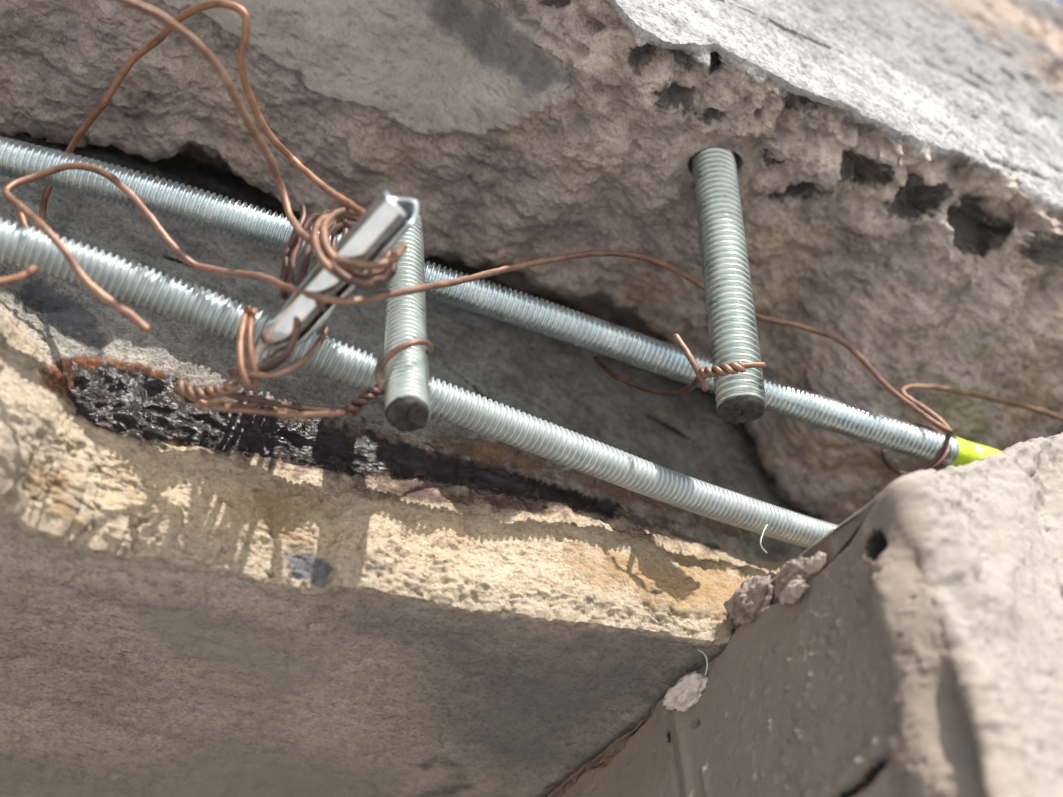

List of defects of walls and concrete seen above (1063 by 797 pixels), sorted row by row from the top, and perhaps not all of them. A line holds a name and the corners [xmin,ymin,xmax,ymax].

crack [719,0,844,53]
spalling [0,0,1063,452]
rust [32,355,748,617]
spalling [0,258,808,642]
spalling [425,296,946,525]